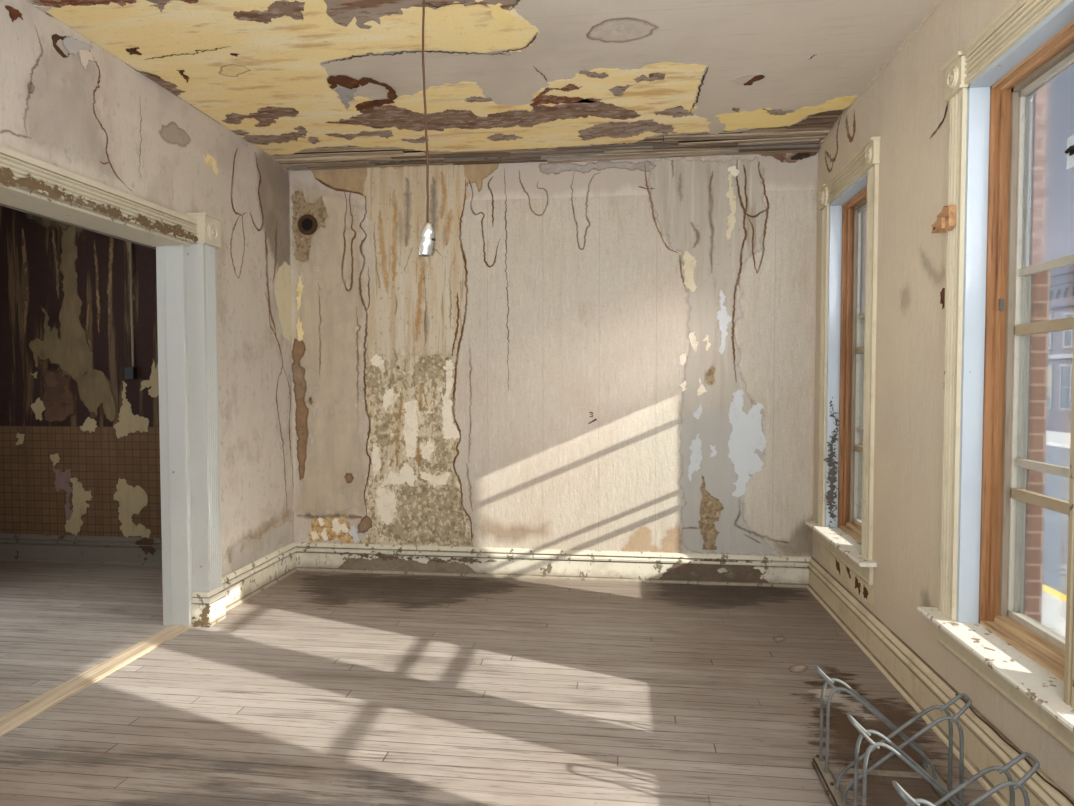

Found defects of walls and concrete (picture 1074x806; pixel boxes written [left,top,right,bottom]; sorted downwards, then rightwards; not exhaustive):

peeling [0,167,198,243]
crack [89,50,132,191]
leakage [308,158,448,291]
peeling [42,0,858,583]
leakage [464,158,500,267]
crack [731,161,769,383]
crack [791,152,817,160]
crack [931,102,948,137]